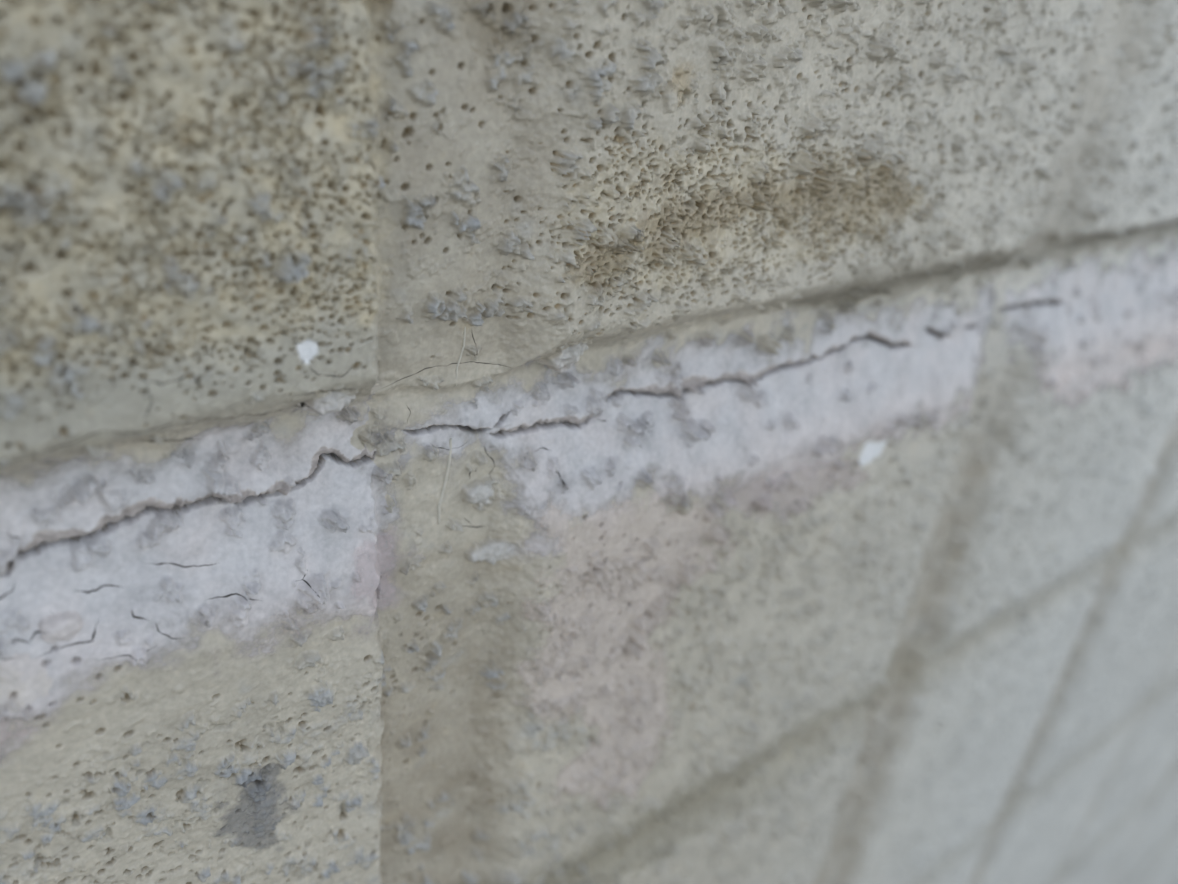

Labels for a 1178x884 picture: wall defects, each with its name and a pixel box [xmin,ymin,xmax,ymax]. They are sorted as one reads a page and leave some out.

spalling [0,0,405,387]
crack [15,366,356,465]
crack [386,298,1063,488]
crack [0,585,183,661]
crack [0,446,376,599]
crack [207,593,262,601]